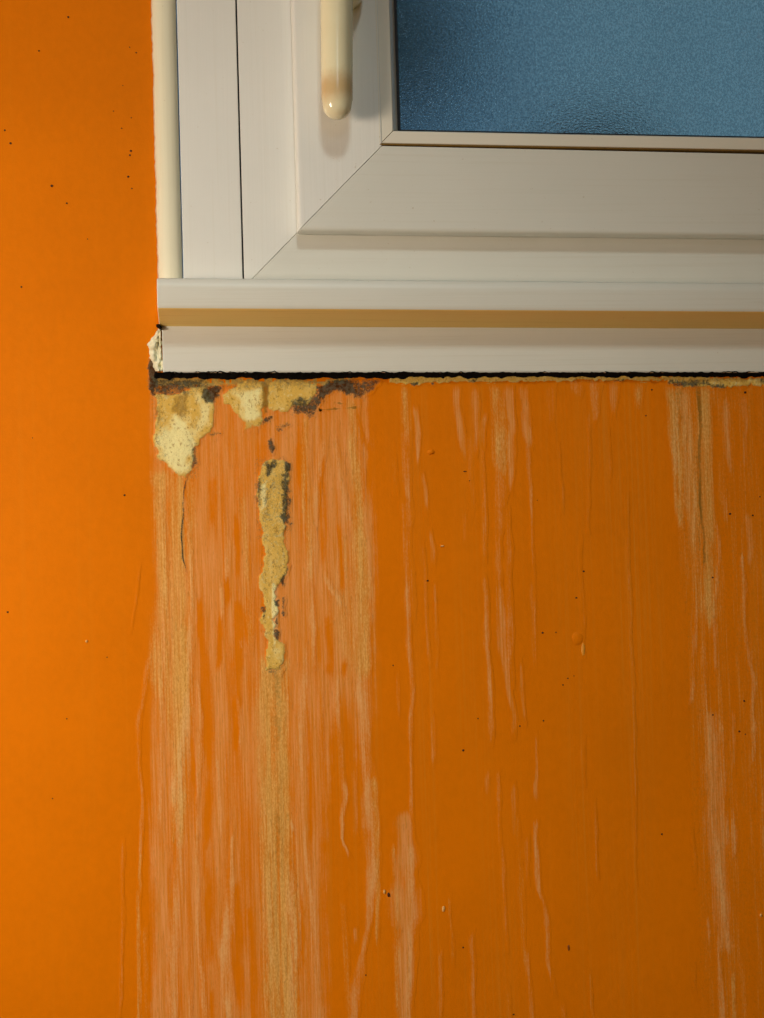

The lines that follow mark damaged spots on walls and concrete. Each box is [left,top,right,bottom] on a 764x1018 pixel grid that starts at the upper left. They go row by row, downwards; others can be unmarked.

crack [179,477,187,574]
peeling [150,379,318,481]
peeling [253,457,294,679]
damp [116,356,764,1018]